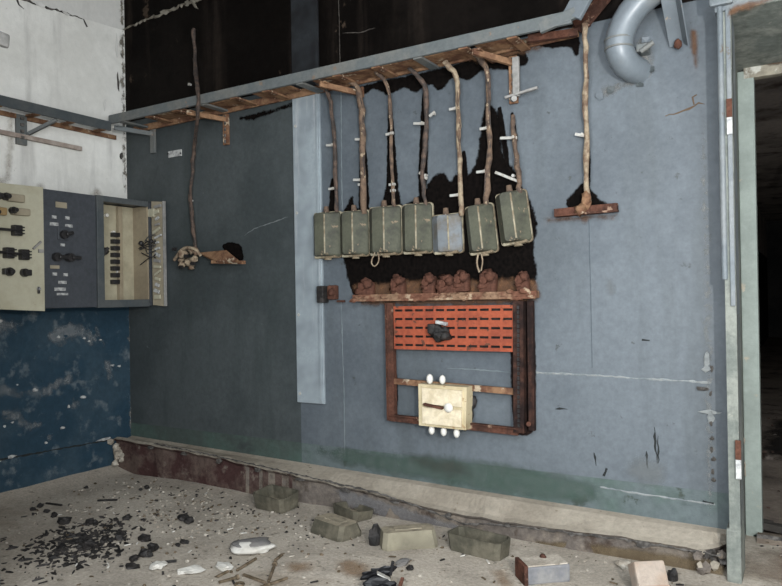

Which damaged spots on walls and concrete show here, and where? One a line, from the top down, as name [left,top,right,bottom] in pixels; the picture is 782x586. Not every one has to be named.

crack [16,0,88,27]
corrosion [729,0,768,14]
spalling [222,242,244,261]
peeling [49,324,110,343]
water stain [762,419,782,457]
spalling [107,439,124,465]